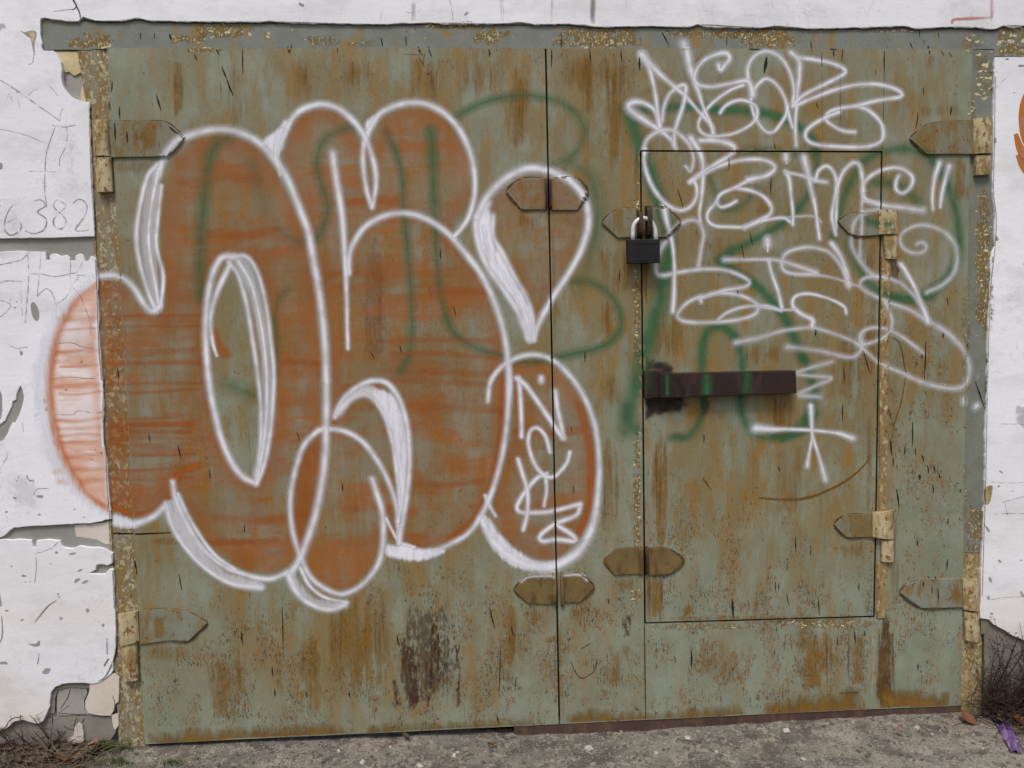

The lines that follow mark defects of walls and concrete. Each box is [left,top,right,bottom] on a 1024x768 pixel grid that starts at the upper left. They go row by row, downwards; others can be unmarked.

spalling [56,33,111,102]
spalling [0,387,24,441]
corrosion [652,447,666,547]
corrosion [759,455,870,501]
spalling [0,509,110,565]
spalling [74,564,111,584]
corrosion [393,624,441,707]
corrosion [877,616,948,708]
spalling [980,619,1024,710]
spalling [0,673,120,748]